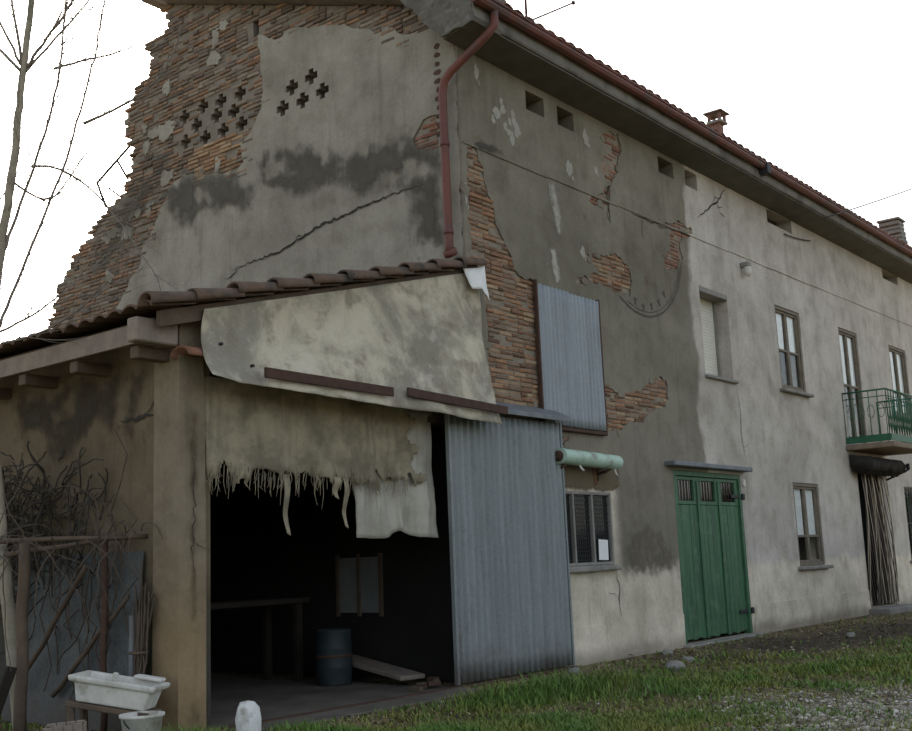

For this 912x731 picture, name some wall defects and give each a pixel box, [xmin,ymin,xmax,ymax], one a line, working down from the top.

water stain [164,173,252,224]
flaking render [48,4,429,329]
crack [227,185,420,279]
water stain [262,138,443,245]
flaking render [459,147,539,408]
flaking render [575,245,631,295]
flaking render [589,131,621,209]
flaking render [663,222,691,270]
crack [700,187,727,215]
flaking render [605,376,671,437]